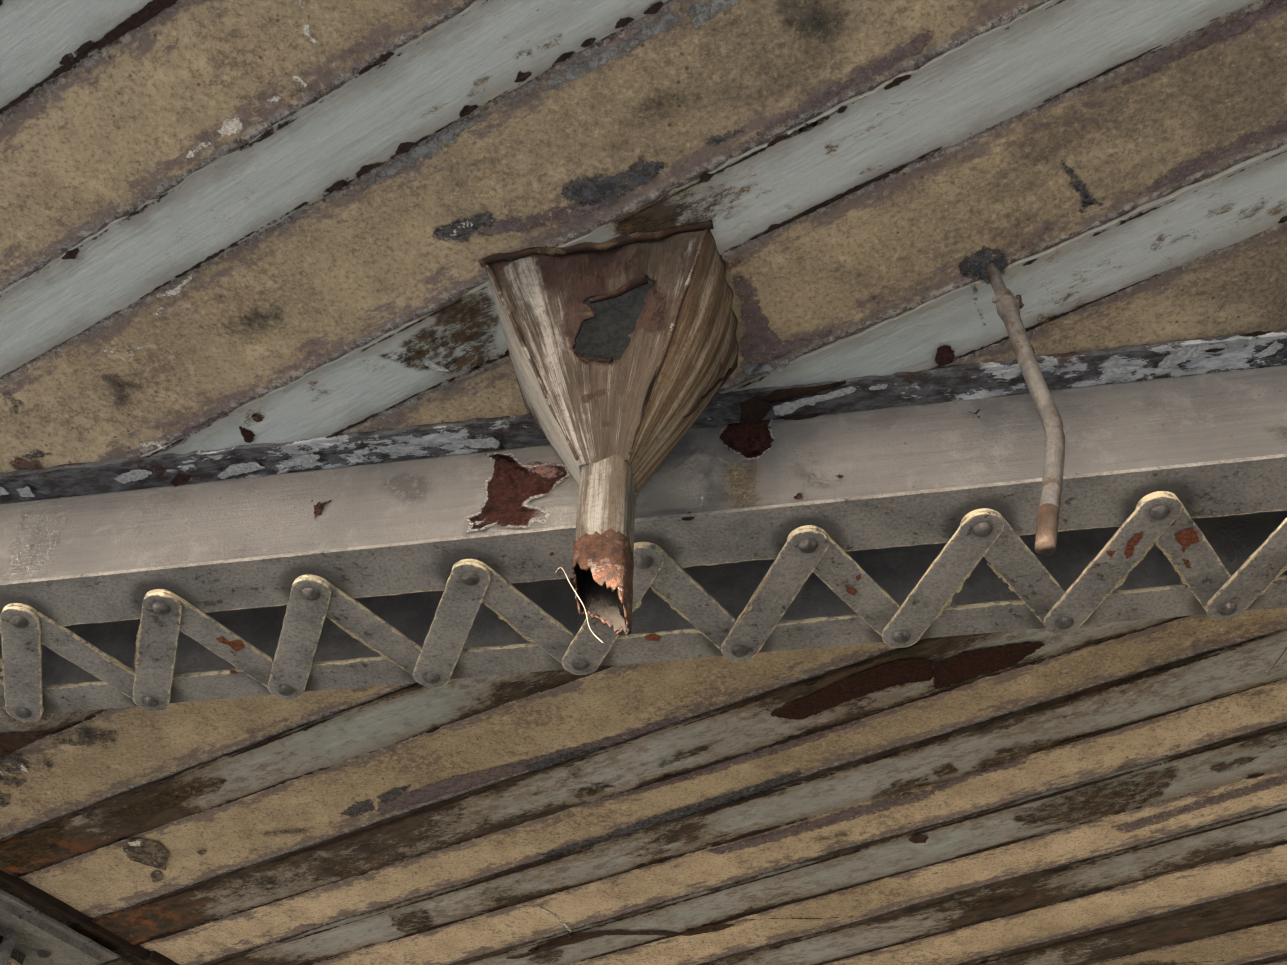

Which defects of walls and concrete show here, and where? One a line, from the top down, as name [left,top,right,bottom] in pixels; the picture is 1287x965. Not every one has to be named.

rust [615,1,664,28]
rust [0,0,178,114]
rust [322,34,596,197]
peeling [1253,341,1284,358]
peeling [354,443,423,455]
peeling [452,437,500,449]
peeling [114,469,152,484]
peeling [217,462,265,479]
peeling [0,486,35,497]
rust [573,615,1286,815]
rust [486,726,1287,965]
rust [212,818,807,965]